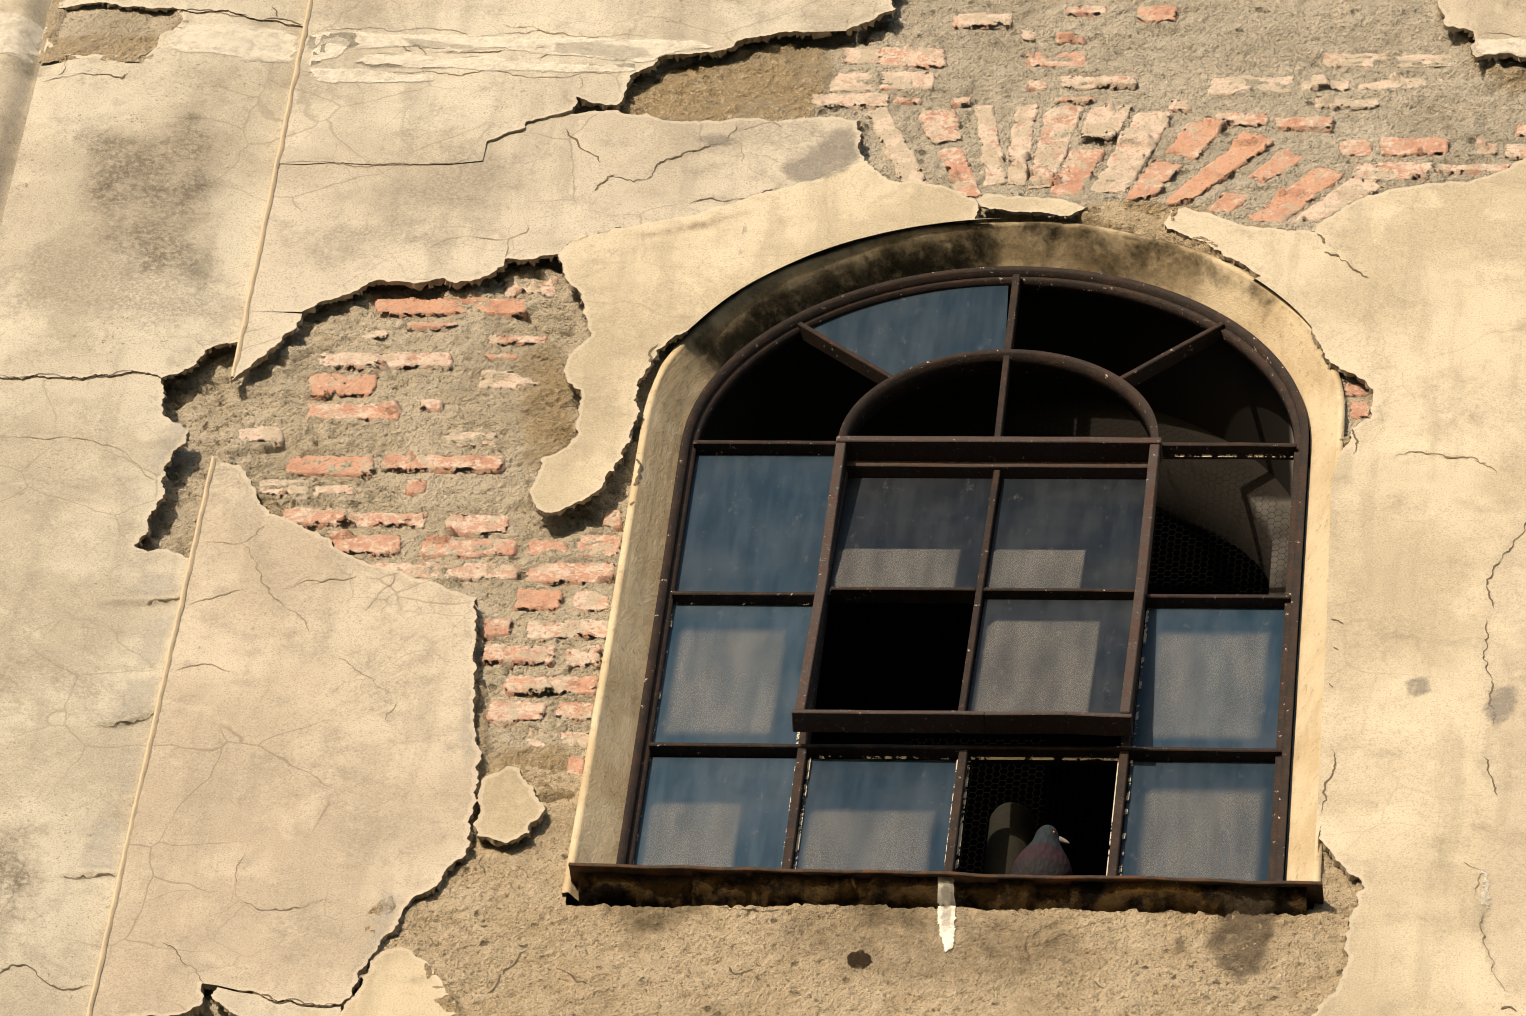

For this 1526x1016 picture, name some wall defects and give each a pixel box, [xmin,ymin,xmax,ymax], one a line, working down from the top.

crack [566,122,782,190]
spalling [0,0,1526,278]
crack [434,220,529,256]
spalling [1339,372,1373,448]
crack [147,527,395,631]
spalling [138,197,1362,1016]
crack [1482,522,1526,796]
crack [1321,752,1336,811]
crack [234,854,334,911]
crack [1464,862,1516,1011]
crack [261,994,341,1008]